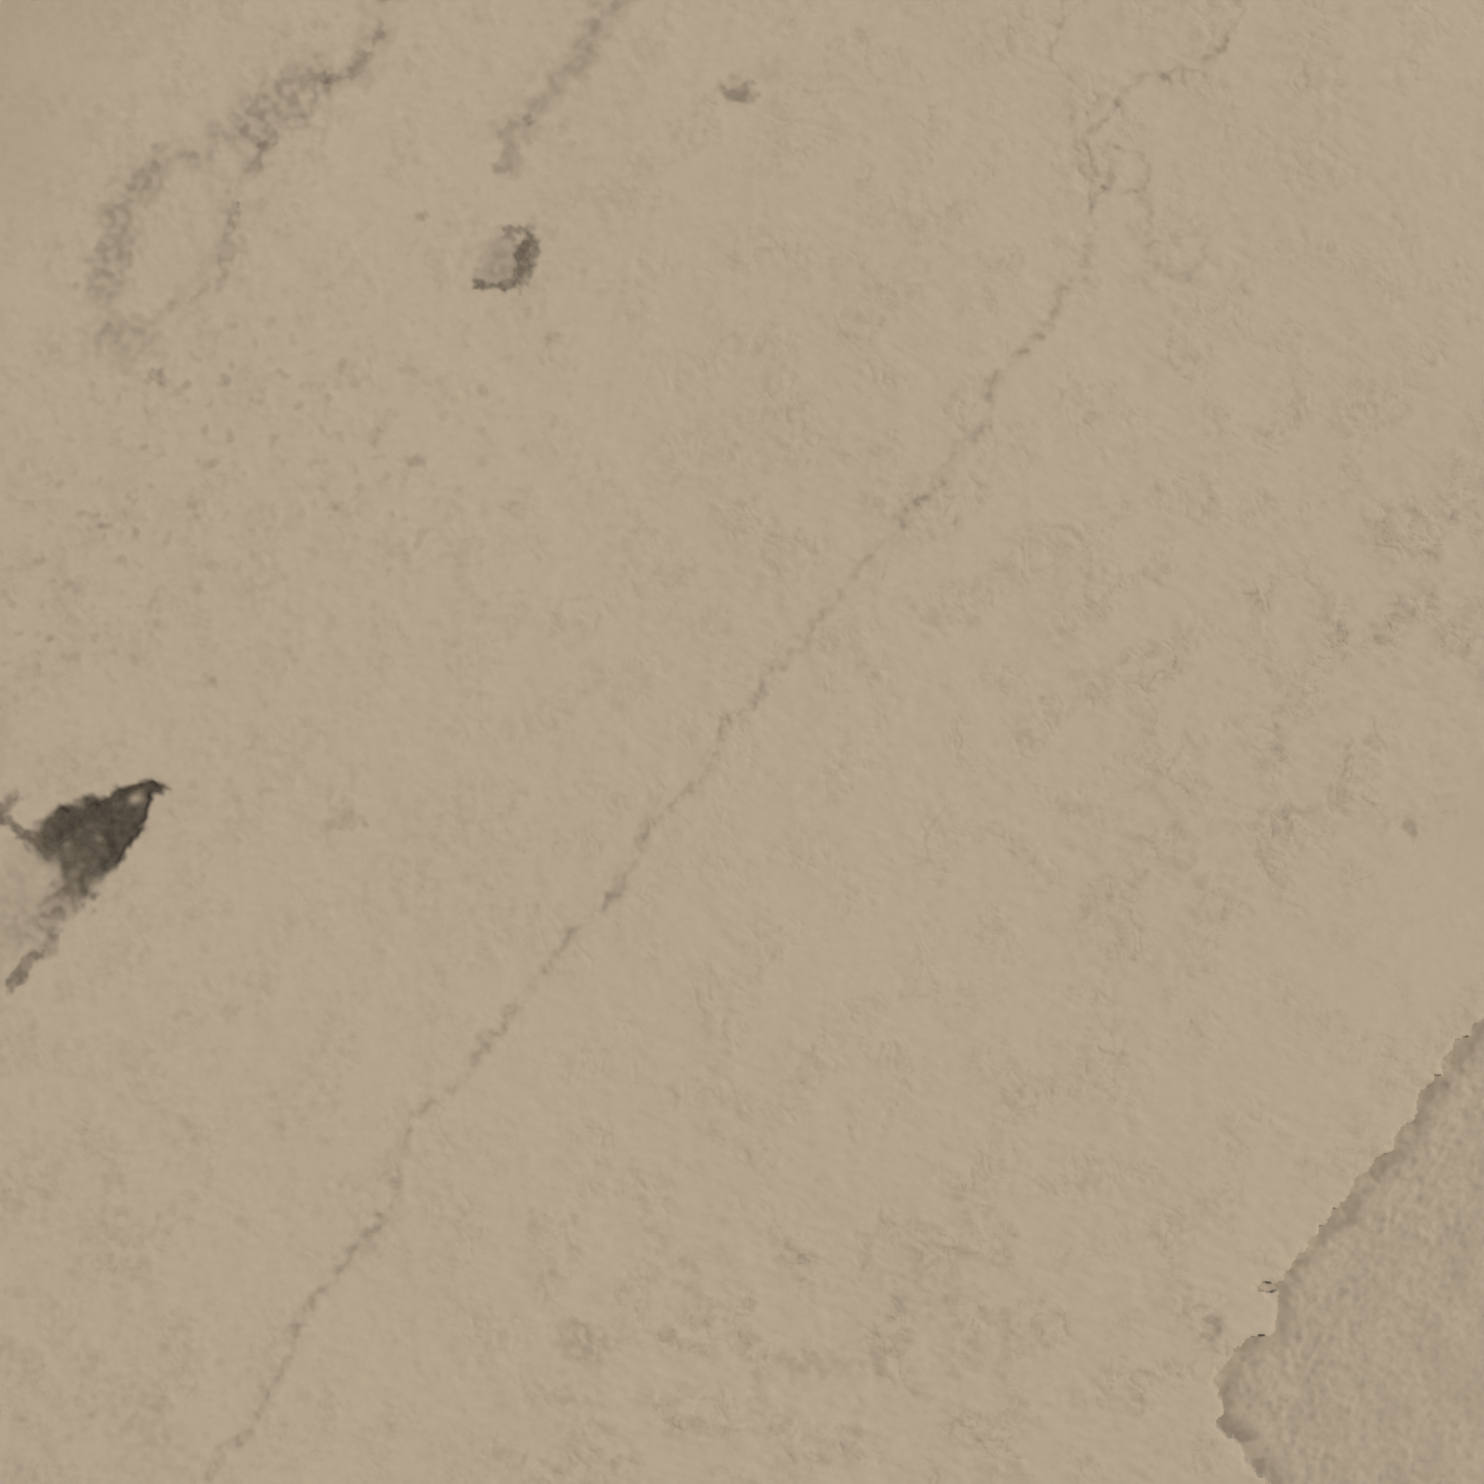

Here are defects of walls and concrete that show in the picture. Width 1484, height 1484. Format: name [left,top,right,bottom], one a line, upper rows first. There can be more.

spalling [474,232,538,291]
spalling [0,780,164,883]
spalling [1212,1018,1484,1484]